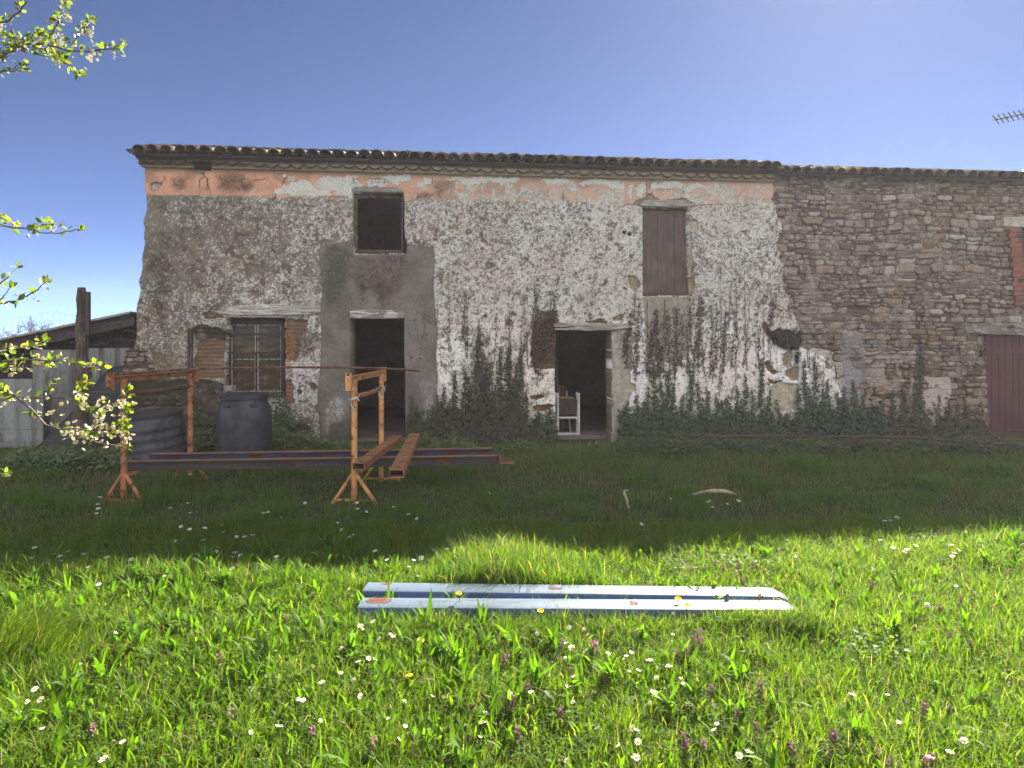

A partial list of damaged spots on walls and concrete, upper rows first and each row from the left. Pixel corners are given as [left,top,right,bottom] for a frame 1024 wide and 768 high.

peeling [274,174,519,201]
peeling [540,178,711,209]
spalling [286,318,308,361]
spalling [530,311,559,369]
spalling [123,312,226,448]
spalling [764,349,799,411]